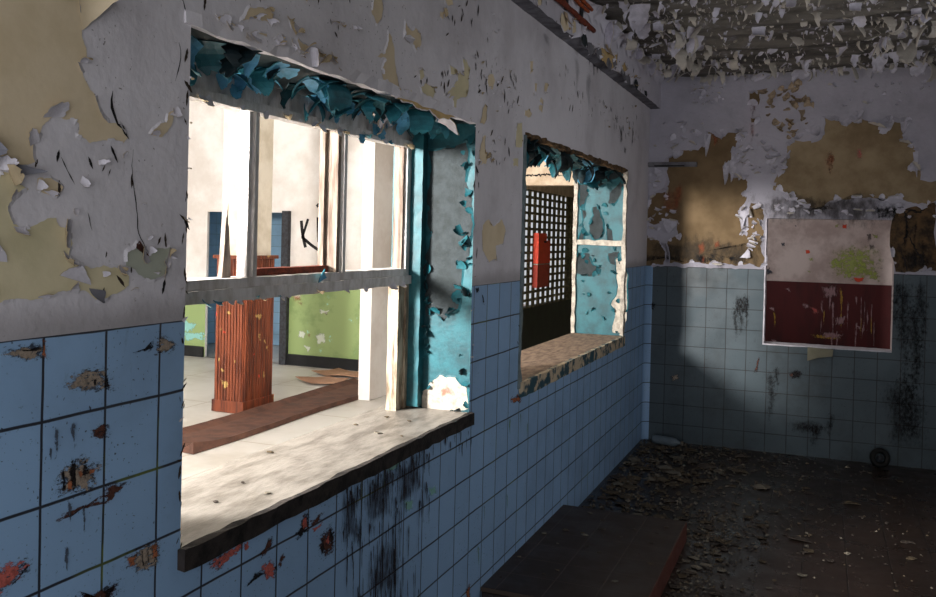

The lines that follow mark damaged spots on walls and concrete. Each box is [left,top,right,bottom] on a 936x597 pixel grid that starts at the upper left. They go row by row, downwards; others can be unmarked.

peeling [0,0,193,305]
peeling [148,0,629,372]
peeling [536,0,936,275]
spalling [418,368,471,412]
damp [734,298,749,330]
damp [821,286,874,346]
damp [887,284,926,441]
damp [343,450,430,597]